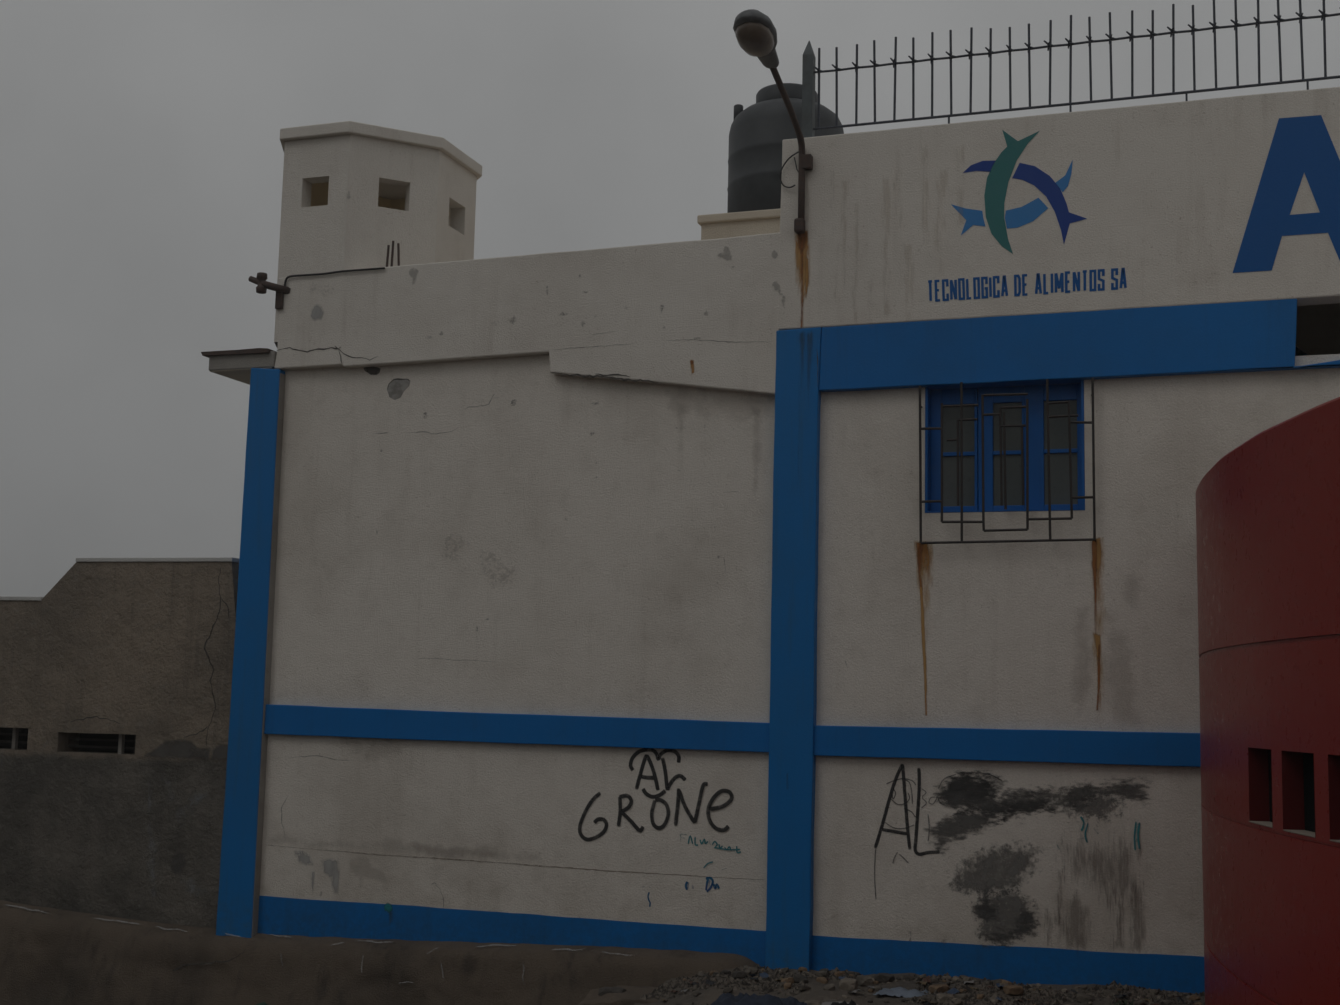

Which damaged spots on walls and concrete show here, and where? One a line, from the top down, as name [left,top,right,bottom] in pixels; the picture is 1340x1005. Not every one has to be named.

crack [276,346,378,363]
rust [795,231,809,327]
rust [917,543,929,715]
rust [1092,538,1101,710]